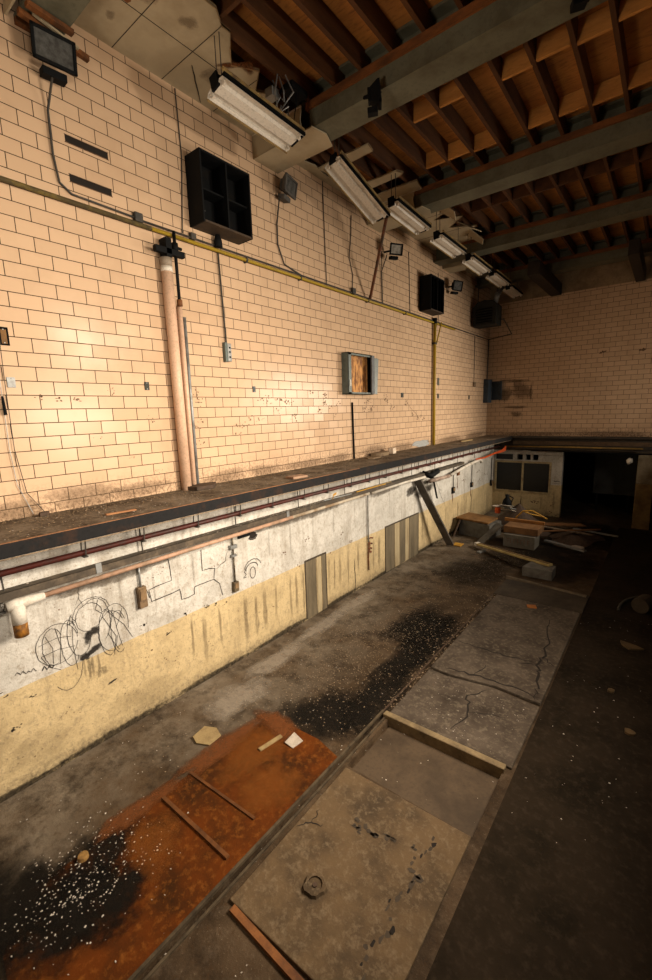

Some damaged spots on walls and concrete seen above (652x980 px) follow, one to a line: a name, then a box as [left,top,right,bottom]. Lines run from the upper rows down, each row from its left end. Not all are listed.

damp [184,656,244,692]
damp [206,566,397,717]
crack [398,606,553,728]
corrosion [99,712,298,864]